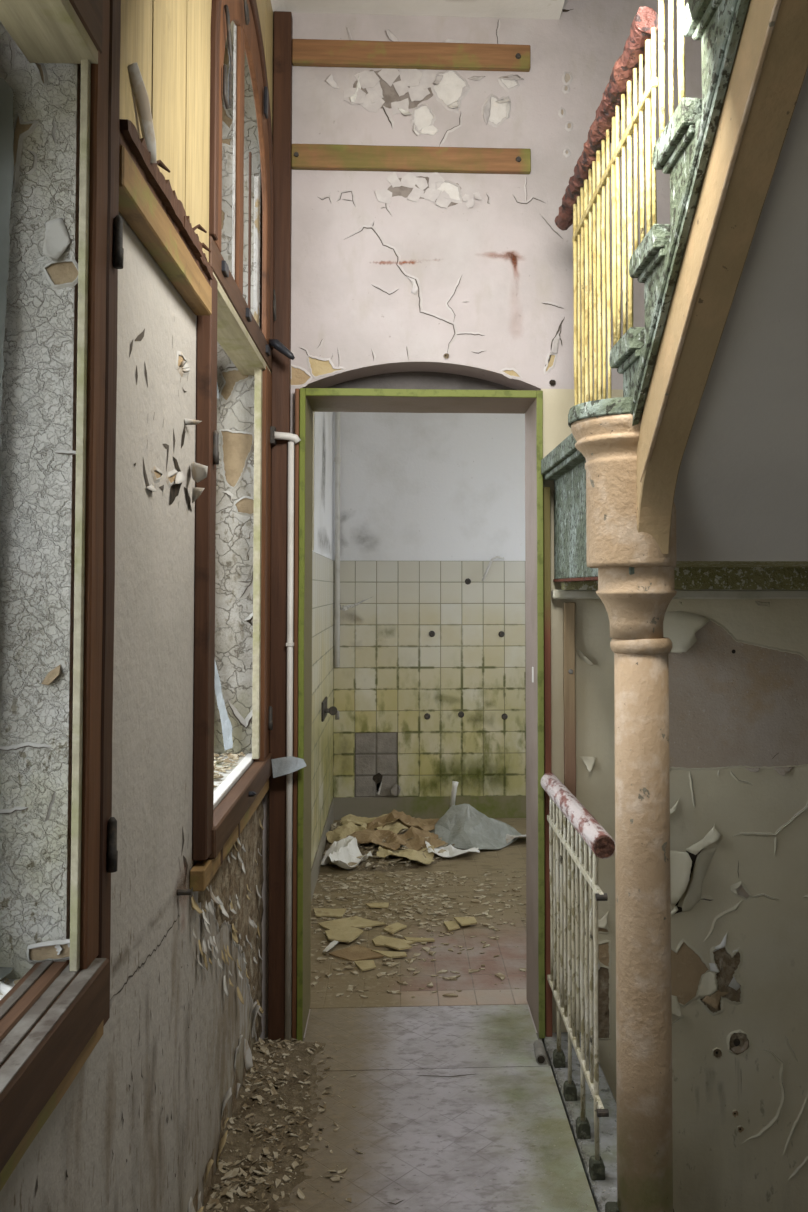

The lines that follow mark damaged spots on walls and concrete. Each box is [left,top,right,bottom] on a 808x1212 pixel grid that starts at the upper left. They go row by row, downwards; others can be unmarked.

peeling [326,68,523,136]
peeling [375,172,482,209]
crack [318,190,487,360]
peeling [129,329,148,386]
crack [54,448,76,456]
peeling [134,412,254,517]
crack [0,742,53,751]
peeling [663,611,808,815]
crack [0,791,55,822]
peeling [670,800,808,916]
peeling [671,881,780,1018]
flaking render [181,801,264,1212]